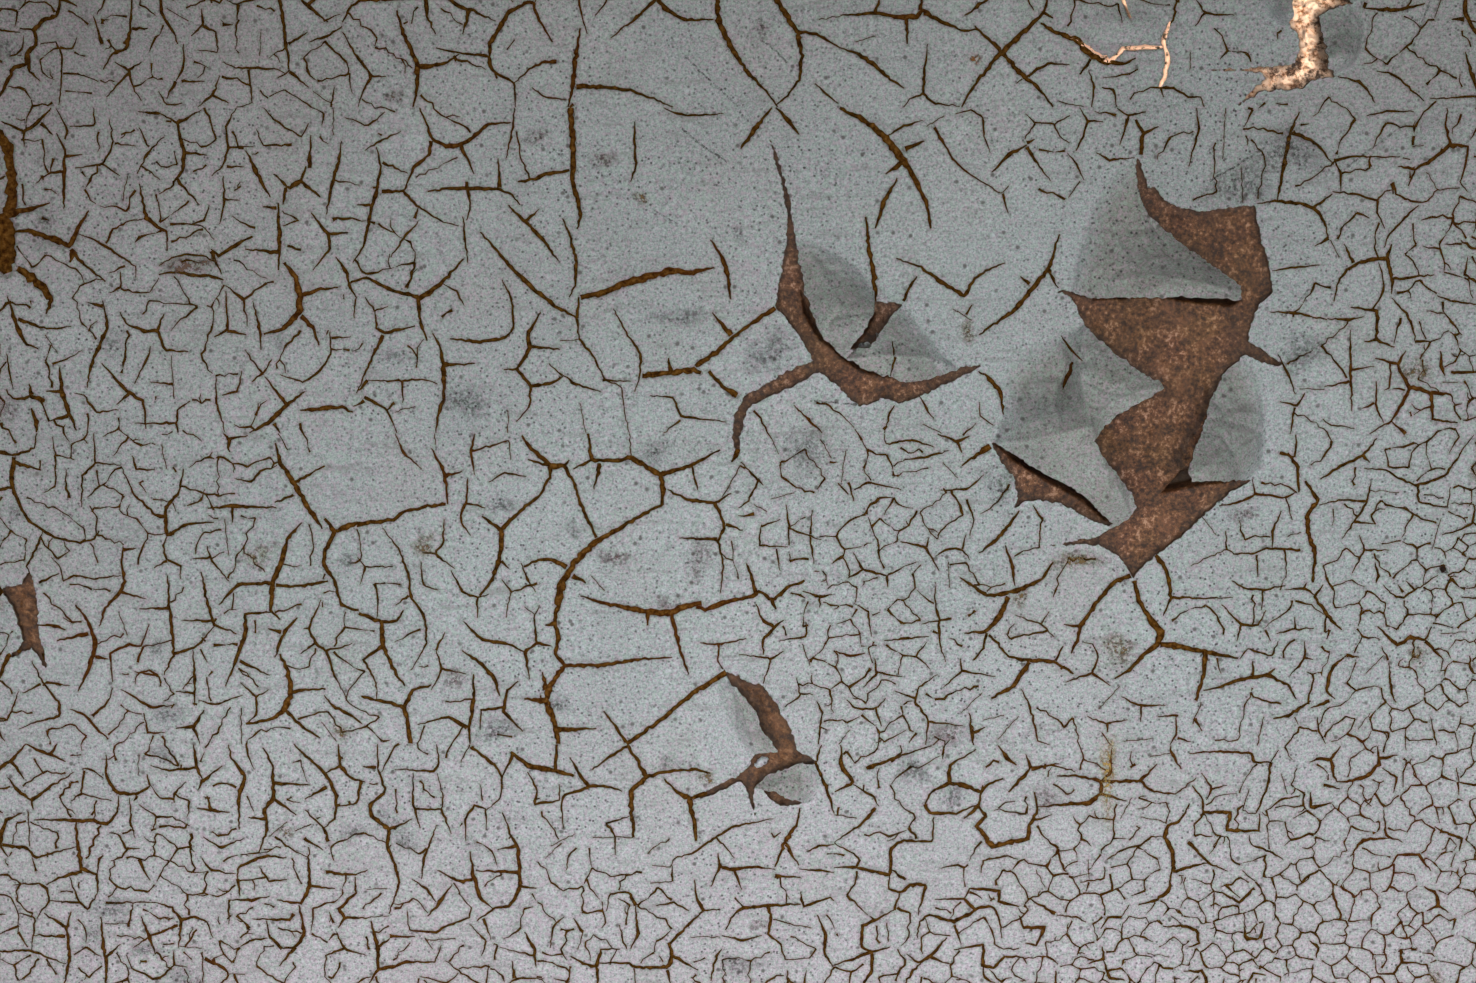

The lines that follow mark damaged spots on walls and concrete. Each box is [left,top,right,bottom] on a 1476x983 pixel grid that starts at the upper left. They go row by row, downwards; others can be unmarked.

spalling [1213,0,1365,105]
crack [0,0,776,983]
spalling [732,141,980,449]
crack [580,0,1476,983]
rust [1058,553,1095,566]
spalling [992,156,1281,577]
spalling [700,672,822,814]